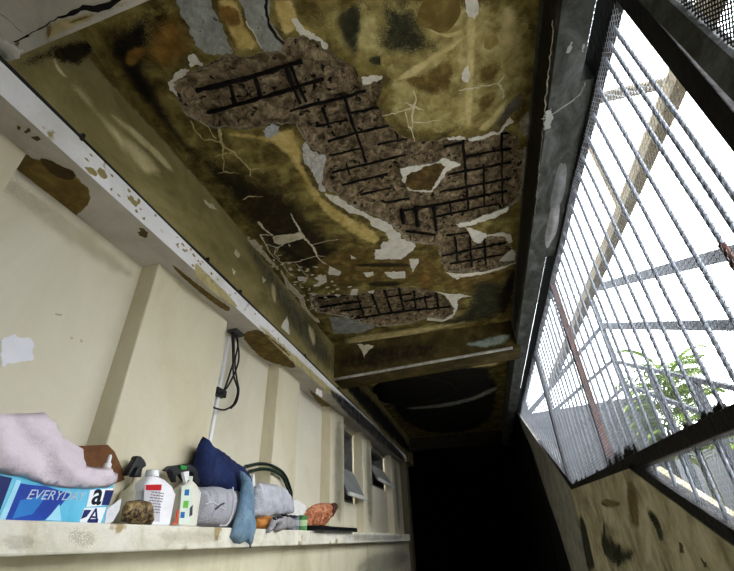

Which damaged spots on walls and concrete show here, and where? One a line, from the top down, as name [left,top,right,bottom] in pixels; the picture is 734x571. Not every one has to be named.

crack [0,0,121,42]
crack [382,91,439,142]
peeling [85,153,114,179]
crack [191,120,264,177]
spalling [168,0,529,334]
peeling [110,188,148,238]
water stain [17,0,560,532]
crack [257,214,338,277]
peeling [0,334,34,367]
water stain [580,517,595,570]
water stain [600,479,665,569]